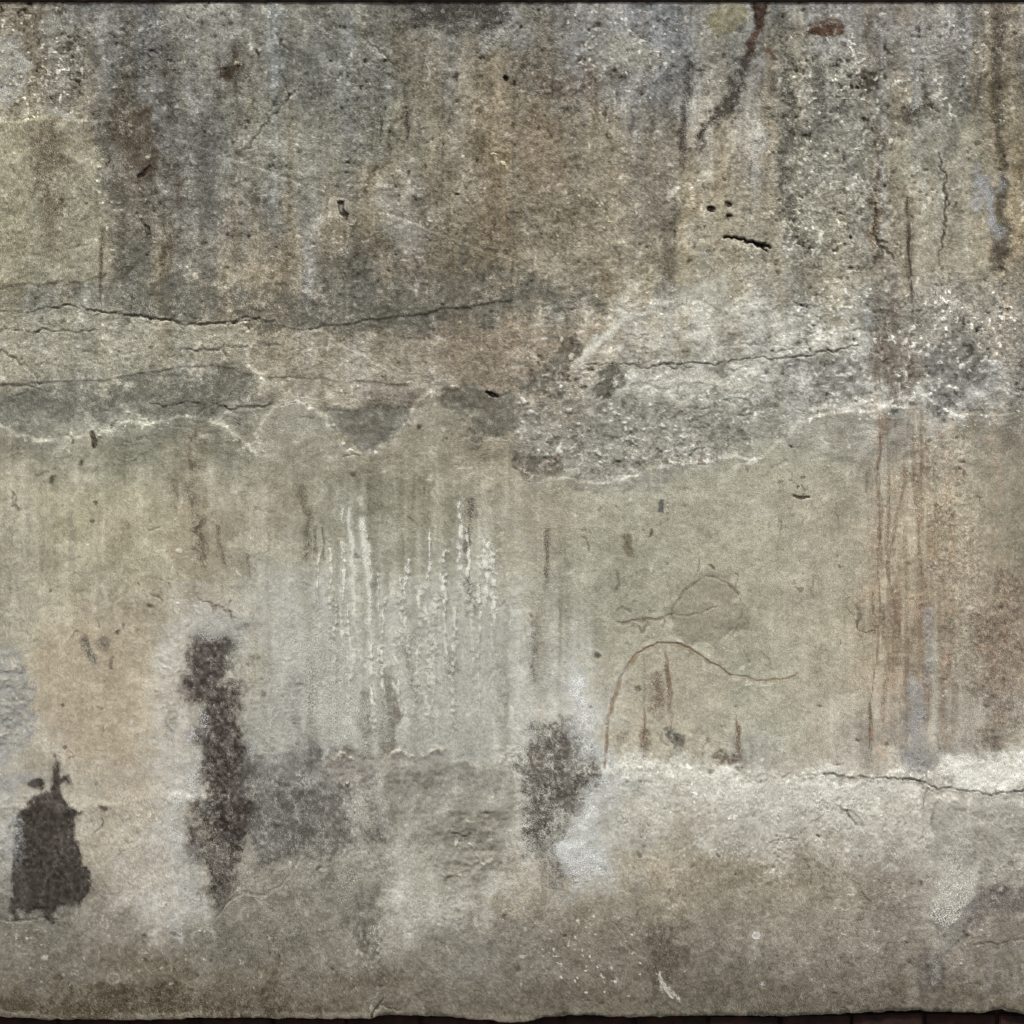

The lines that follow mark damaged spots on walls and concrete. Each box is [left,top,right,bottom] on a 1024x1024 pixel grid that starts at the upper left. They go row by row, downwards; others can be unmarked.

rust [749,3,767,52]
crack [724,236,771,252]
water stain [0,756,91,924]
water stain [165,486,522,960]
crack [604,617,796,768]
water stain [401,663,1024,1000]
crack [890,778,1016,803]